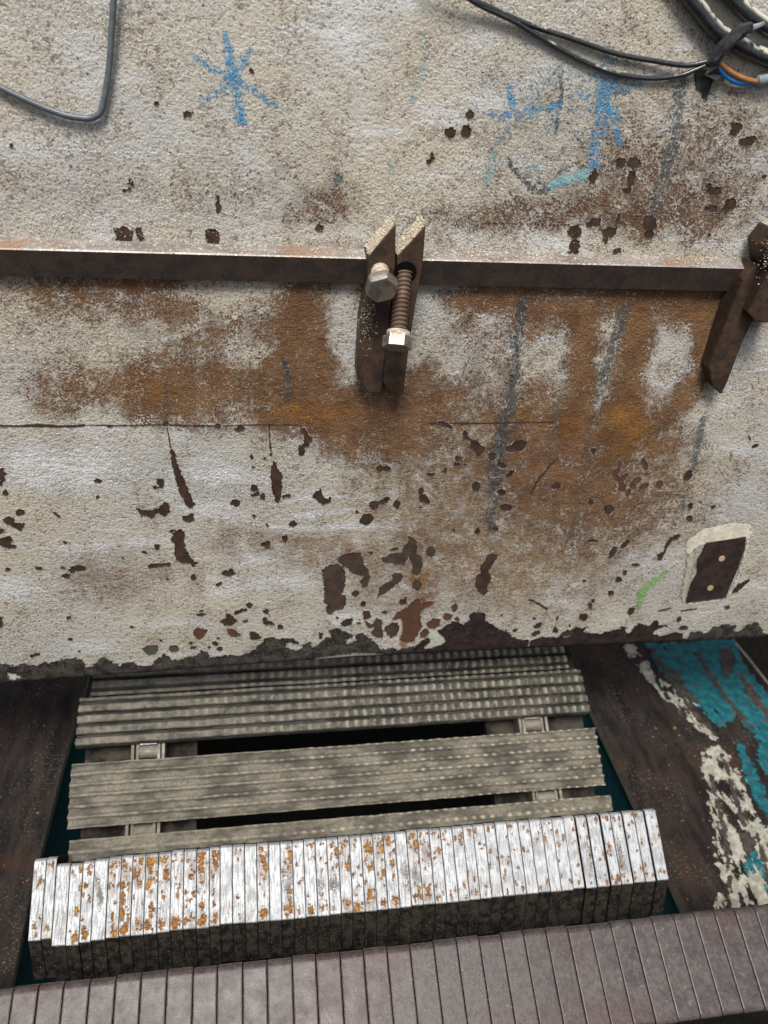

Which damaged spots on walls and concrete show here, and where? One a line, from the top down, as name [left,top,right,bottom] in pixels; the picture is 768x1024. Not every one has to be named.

peeling [587,168,599,185]
peeling [616,157,642,194]
peeling [113,225,145,242]
peeling [205,228,220,244]
crack [482,220,584,228]
peeling [567,212,624,255]
crack [429,419,553,427]
rust [0,276,764,646]
peeling [0,468,9,496]
peeling [0,509,25,549]
peeling [136,449,198,581]
peeling [0,534,768,909]